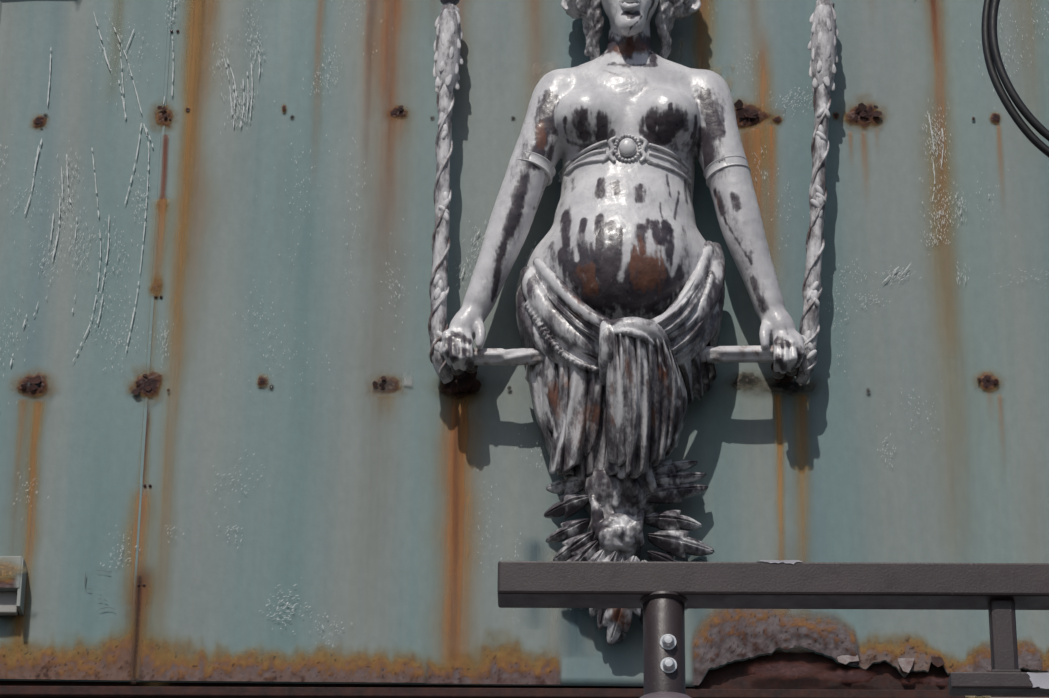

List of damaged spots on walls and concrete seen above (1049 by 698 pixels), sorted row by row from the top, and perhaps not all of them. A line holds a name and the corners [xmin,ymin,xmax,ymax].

rust [930,0,945,147]
rust [150,0,212,342]
rust [387,105,408,119]
rust [734,59,782,214]
rust [833,103,883,128]
rust [977,372,1000,390]
rust [0,371,560,684]
rust [692,609,992,685]
rust [1017,642,1049,672]